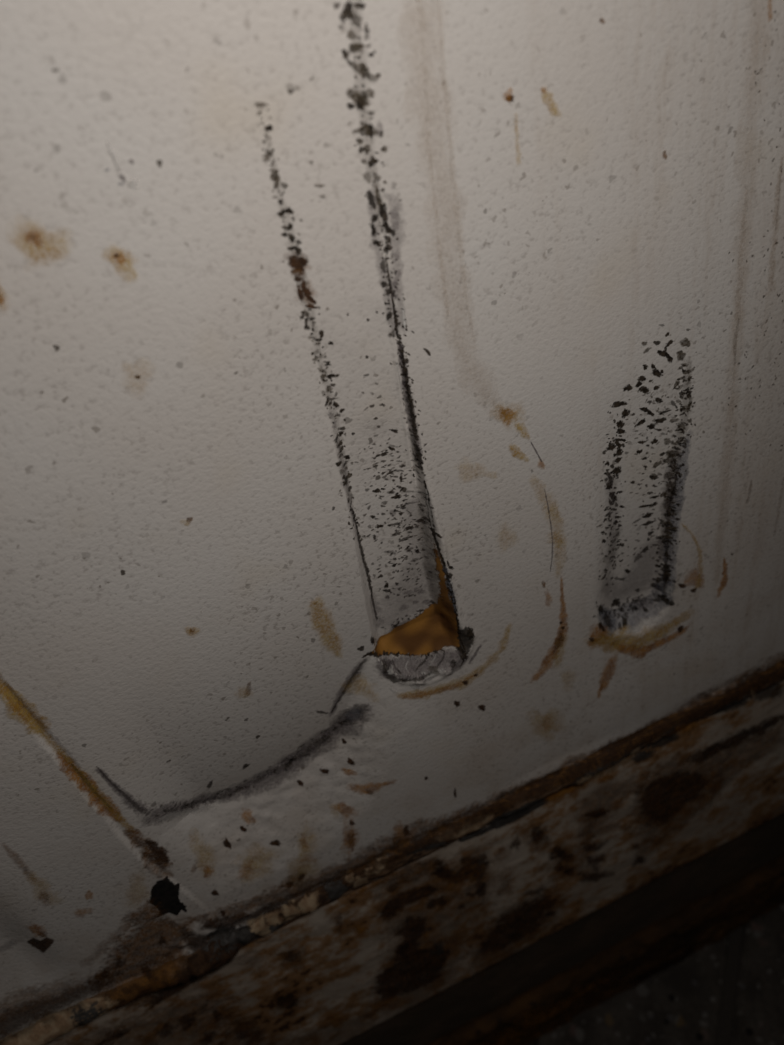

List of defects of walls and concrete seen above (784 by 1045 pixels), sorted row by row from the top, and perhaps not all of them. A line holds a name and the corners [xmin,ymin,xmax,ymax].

leakage [378,211,423,470]
leakage [353,510,378,619]
rust [533,580,567,680]
rust [589,613,686,695]
rust [0,683,172,874]
crack [98,710,365,821]
rust [90,656,784,1009]
peeling [150,876,187,917]